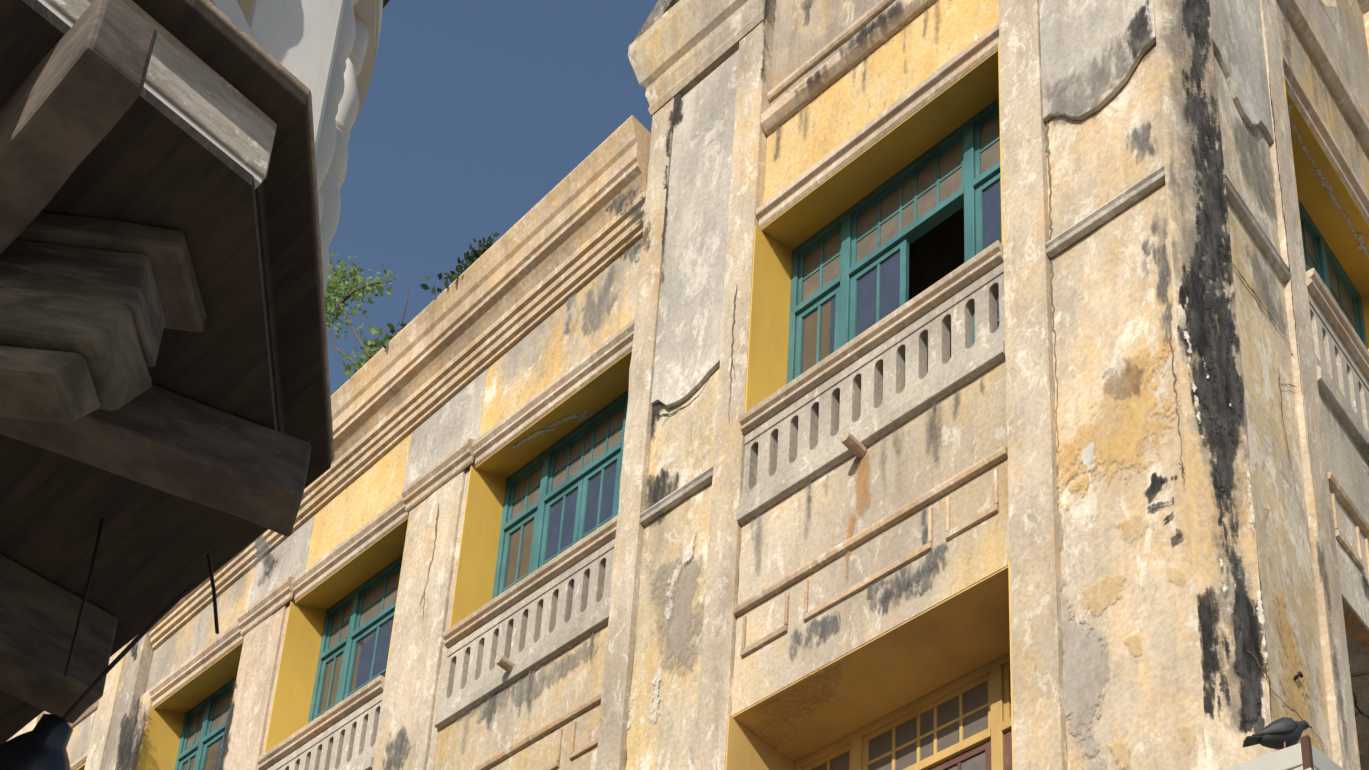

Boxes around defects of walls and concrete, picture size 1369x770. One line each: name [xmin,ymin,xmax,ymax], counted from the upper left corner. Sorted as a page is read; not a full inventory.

leakage [1047,0,1285,733]
peeling [1056,331,1209,550]
peeling [1247,471,1255,530]
leakage [867,509,947,614]
leakage [115,694,143,770]
peeling [1060,574,1141,770]
flaking render [1345,612,1369,658]
crack [1351,673,1369,719]